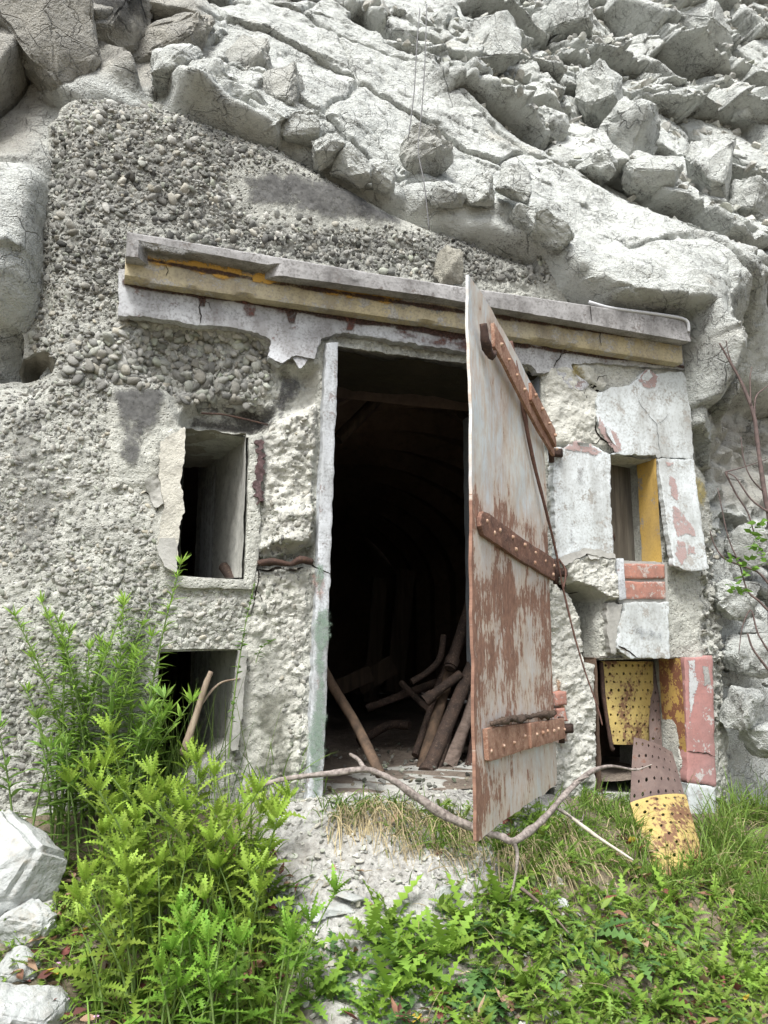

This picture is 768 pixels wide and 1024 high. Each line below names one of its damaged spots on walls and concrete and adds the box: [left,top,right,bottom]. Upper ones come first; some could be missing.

leakage [114,388,163,464]
spalling [19,97,555,573]
rust [122,279,467,351]
rust [147,257,465,313]
rust [494,314,633,338]
spalling [544,365,622,455]
rust [513,342,684,368]
peeling [639,369,658,388]
rust [252,439,266,505]
rust [257,556,322,594]